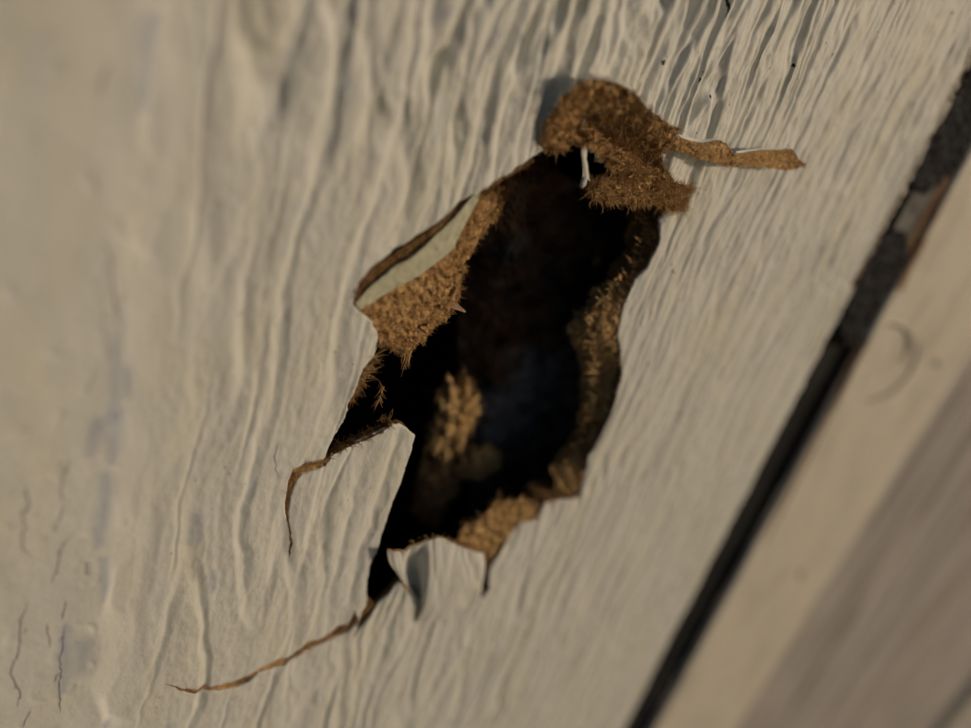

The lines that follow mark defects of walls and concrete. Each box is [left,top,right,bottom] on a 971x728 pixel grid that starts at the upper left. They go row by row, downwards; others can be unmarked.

peeling [536,71,806,220]
spalling [368,208,454,281]
spalling [327,309,486,623]